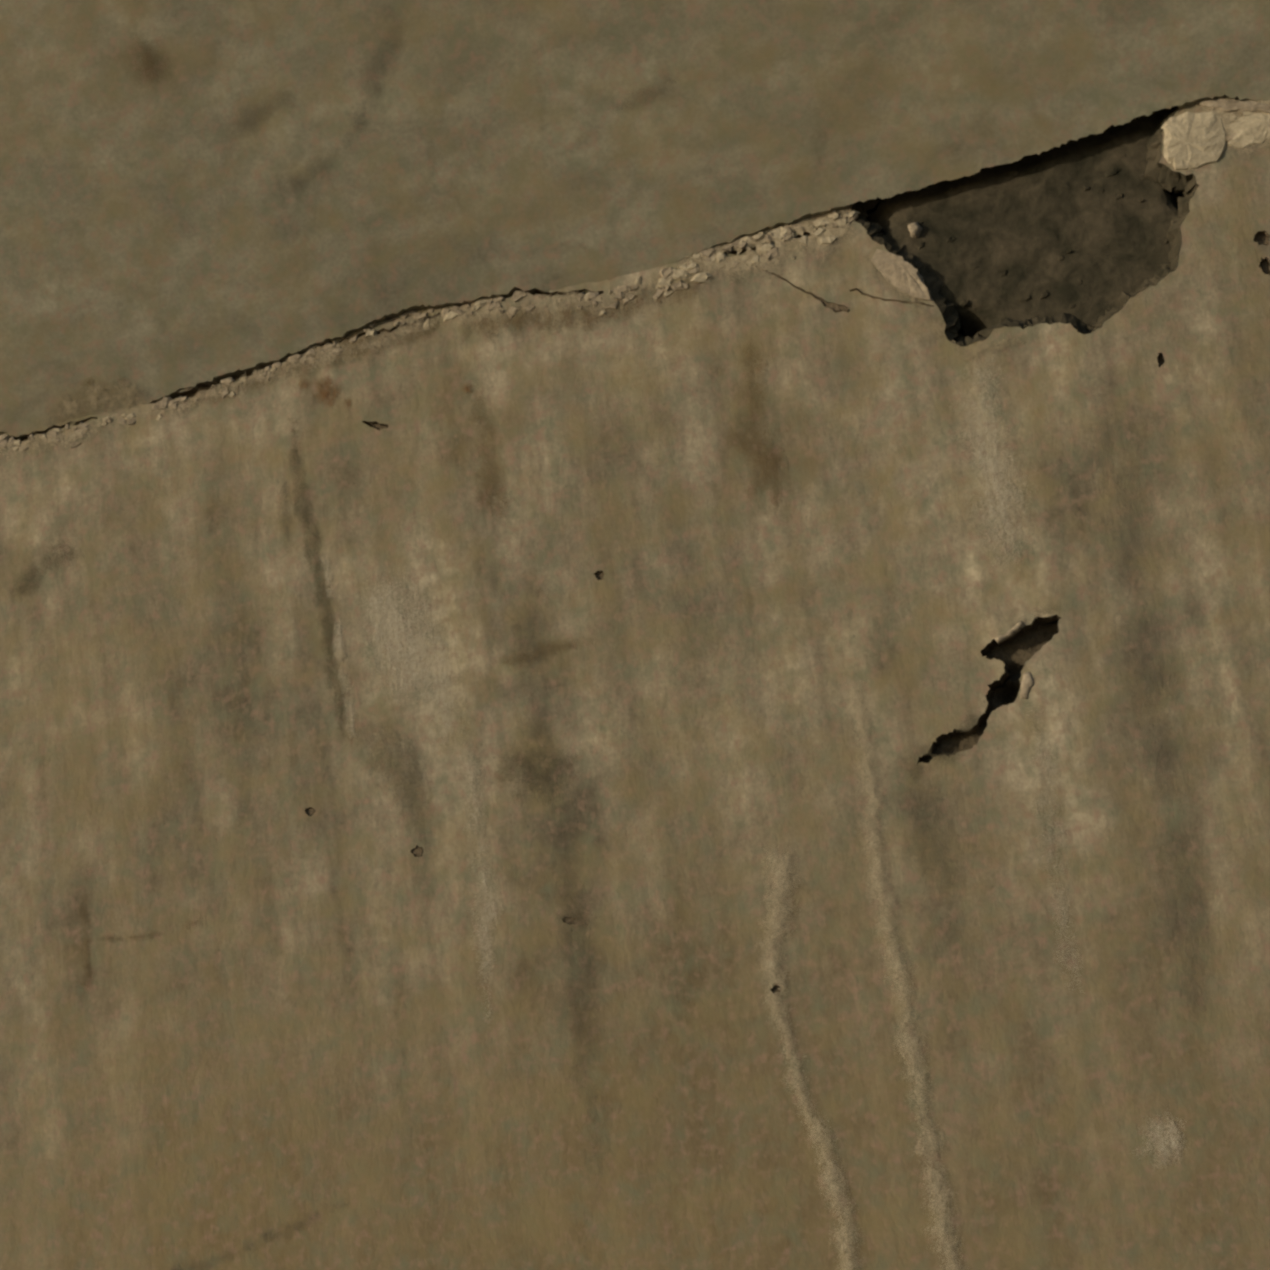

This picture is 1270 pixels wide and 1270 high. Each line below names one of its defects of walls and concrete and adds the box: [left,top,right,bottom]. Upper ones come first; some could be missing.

crack [0,275,664,460]
crack [755,266,933,312]
spalling [656,97,1270,364]
spalling [898,603,1063,786]
damp [278,414,620,1214]